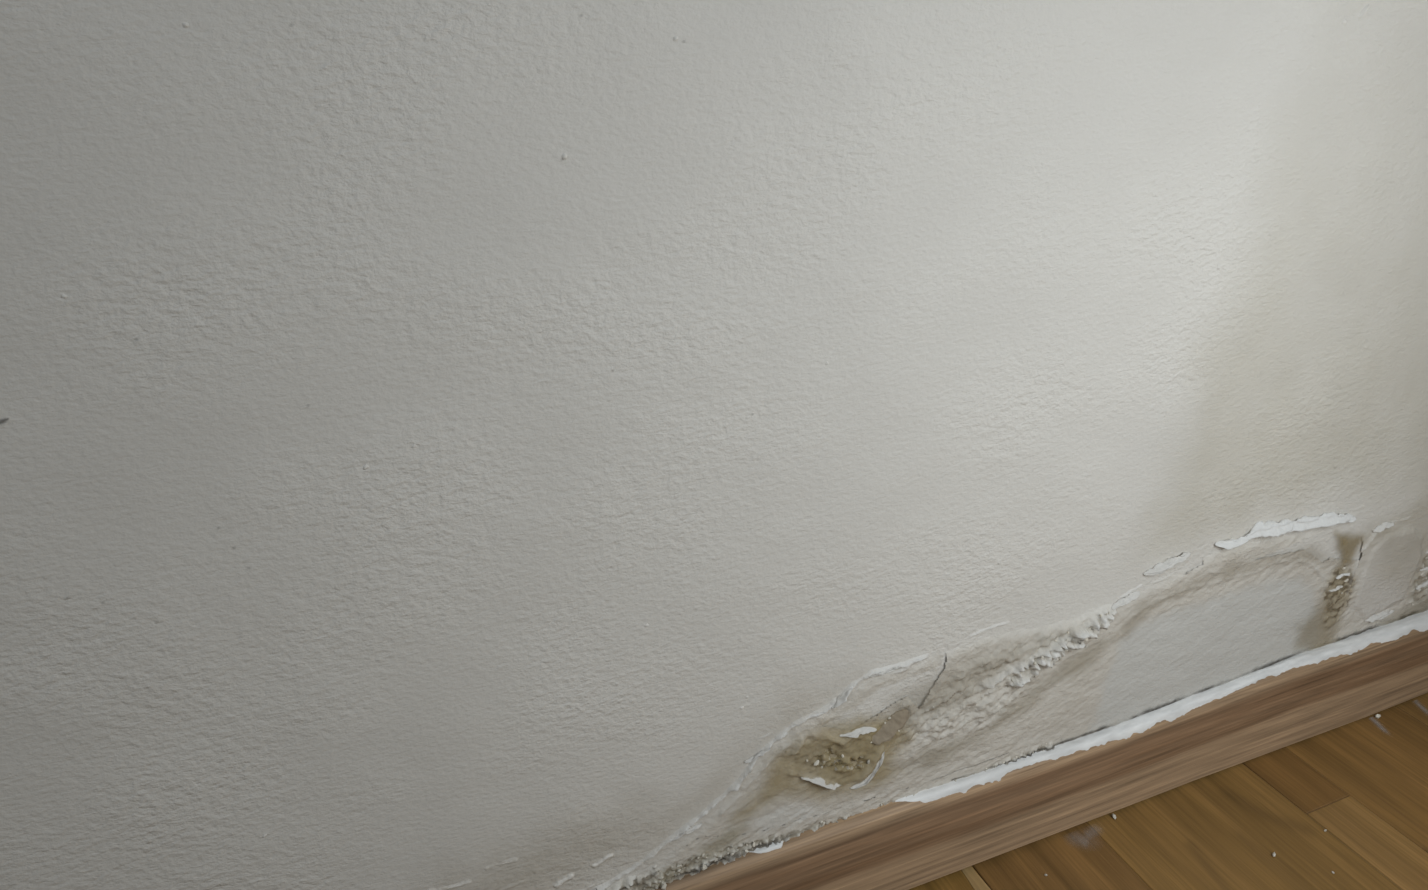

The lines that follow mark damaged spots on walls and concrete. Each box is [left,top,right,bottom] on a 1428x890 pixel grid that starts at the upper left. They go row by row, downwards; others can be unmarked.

water stain [1341,537,1359,562]
flaking render [1402,538,1428,617]
water stain [703,635,1113,837]
flaking render [592,512,1360,890]